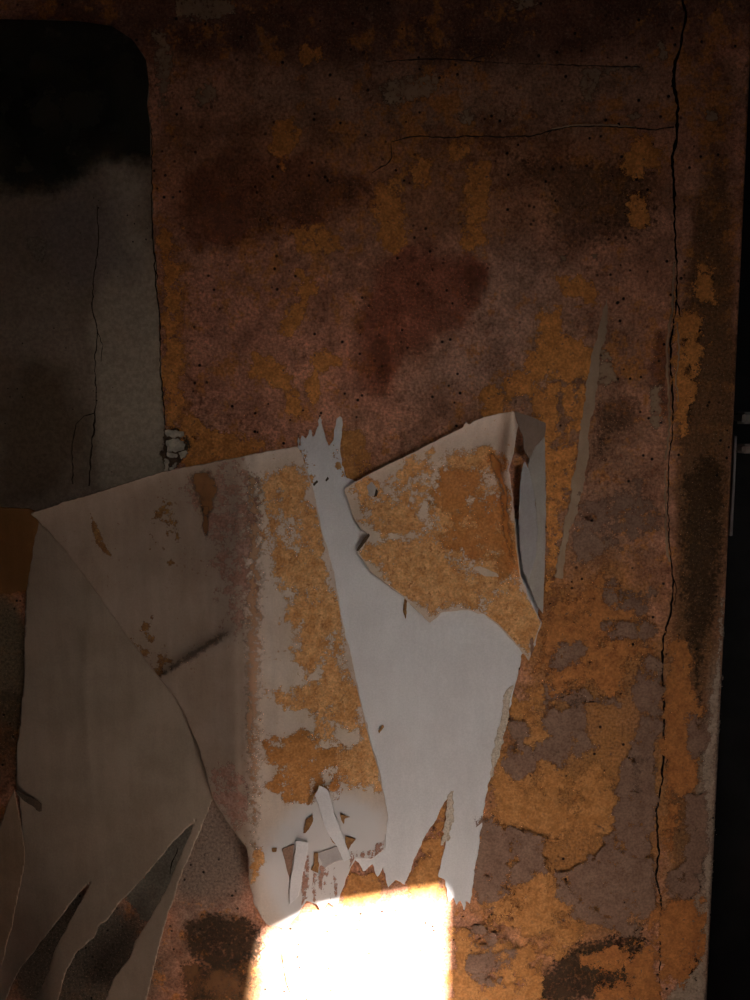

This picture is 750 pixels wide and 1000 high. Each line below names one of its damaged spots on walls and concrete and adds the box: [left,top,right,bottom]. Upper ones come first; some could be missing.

crack [71,207,103,486]
water stain [358,249,484,388]
flaking render [159,426,192,471]
corrosion [192,471,217,535]
crack [372,0,687,995]
corrosion [244,476,262,825]
peeling [125,824,193,923]
peeling [301,856,309,905]
corrosion [303,792,315,833]
corrosion [311,852,319,873]
peeling [473,639,661,938]
peeling [666,597,726,1000]